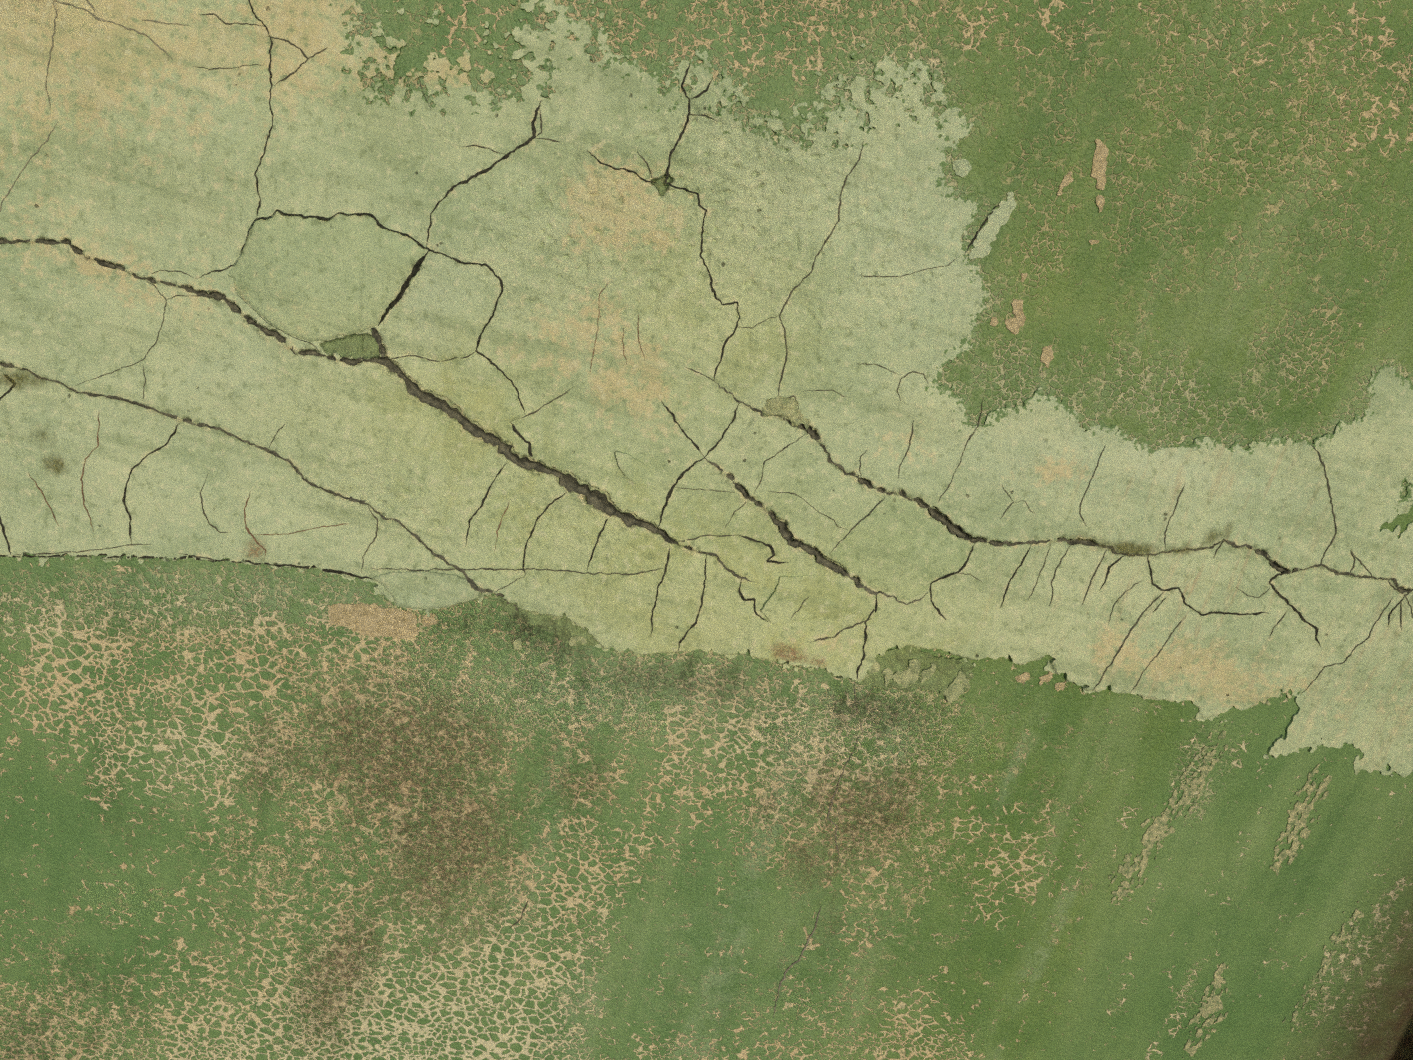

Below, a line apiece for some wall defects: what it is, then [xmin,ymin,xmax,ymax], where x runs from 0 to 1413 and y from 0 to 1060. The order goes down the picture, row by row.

crack [0,0,864,652]
peeling [0,0,1413,777]
crack [857,363,929,400]
crack [864,205,999,277]
crack [939,398,984,501]
crack [713,415,1413,859]
peeling [1108,723,1228,907]
peeling [1266,763,1333,877]